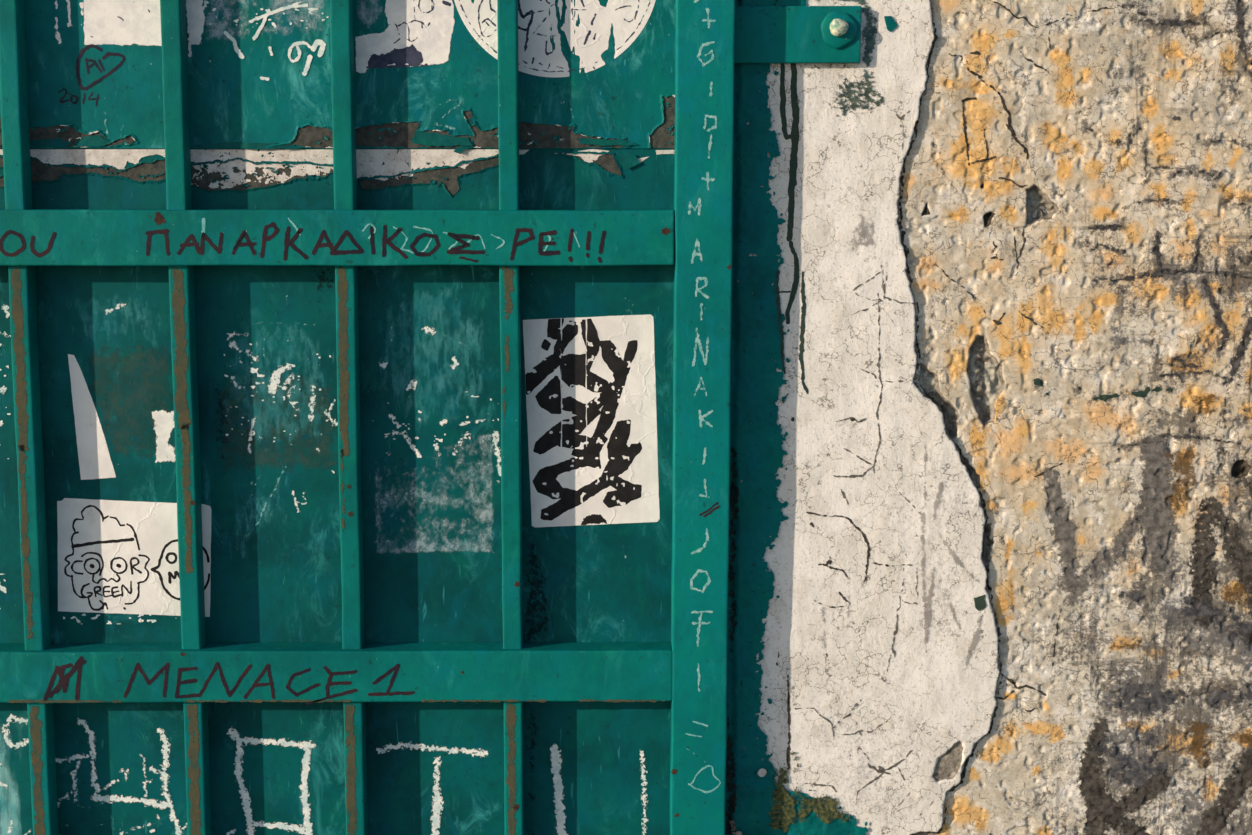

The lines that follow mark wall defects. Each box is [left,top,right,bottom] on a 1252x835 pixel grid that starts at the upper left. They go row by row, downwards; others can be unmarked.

peeling [29,123,166,184]
peeling [190,122,333,193]
peeling [356,108,499,197]
peeling [519,93,675,179]
flaking render [1025,185,1059,227]
corrosion [11,268,34,639]
corrosion [172,269,196,573]
corrosion [337,267,354,529]
crack [795,22,1062,835]
flaking render [918,363,959,440]
flaking render [967,335,1005,426]
flaking render [982,523,994,569]